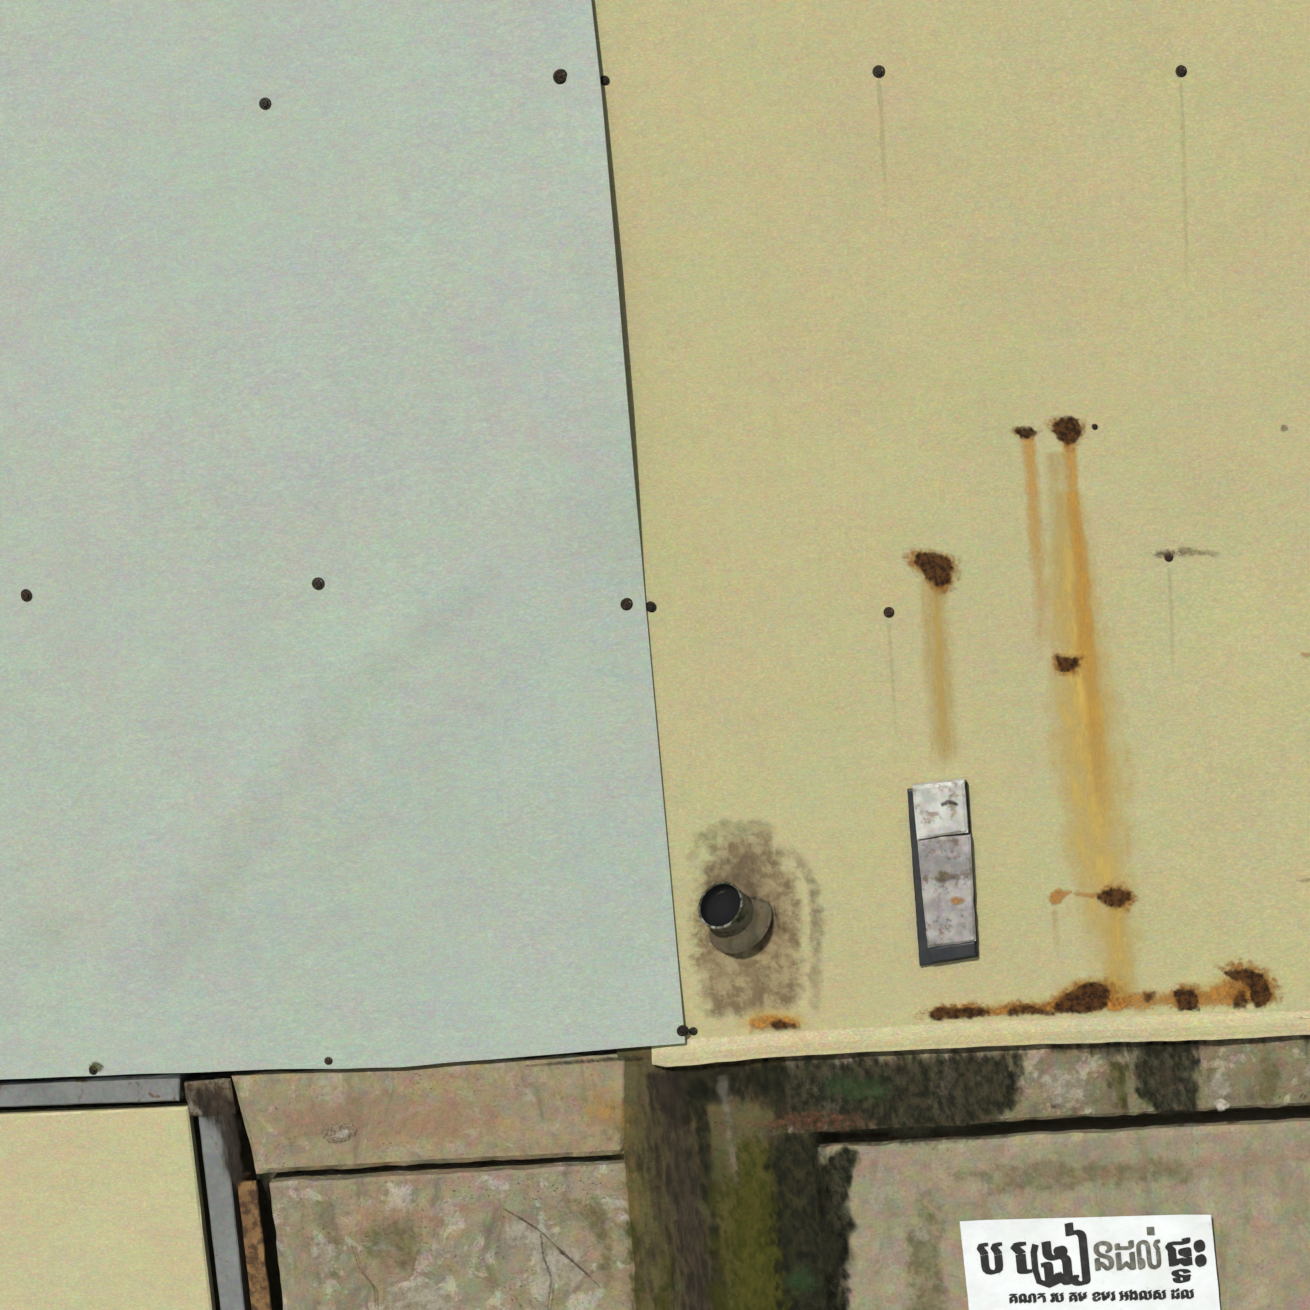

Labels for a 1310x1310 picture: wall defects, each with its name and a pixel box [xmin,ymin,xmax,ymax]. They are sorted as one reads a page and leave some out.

rust [905,551,955,623]
rust [930,416,1278,1021]
rust [750,1015,799,1030]
water stain [588,1051,1024,1310]